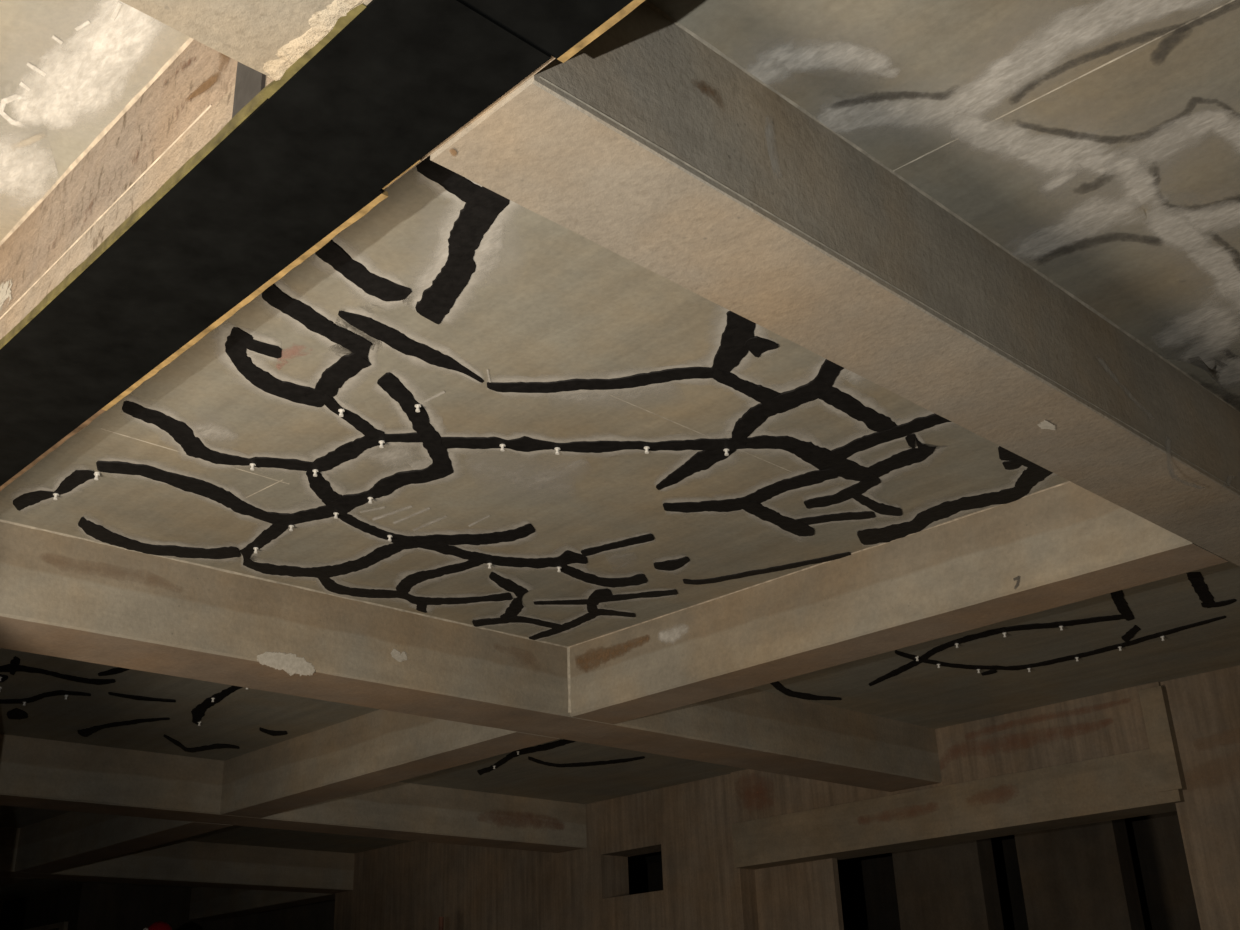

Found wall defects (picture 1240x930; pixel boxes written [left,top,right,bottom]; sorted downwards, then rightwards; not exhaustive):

damp [0,0,159,200]
spalling [263,0,365,81]
damp [747,43,896,83]
damp [819,0,1240,412]
crack [13,156,1057,641]
crack [0,656,288,753]
peeling [257,652,315,676]
crack [770,681,841,700]
crack [869,572,1236,686]